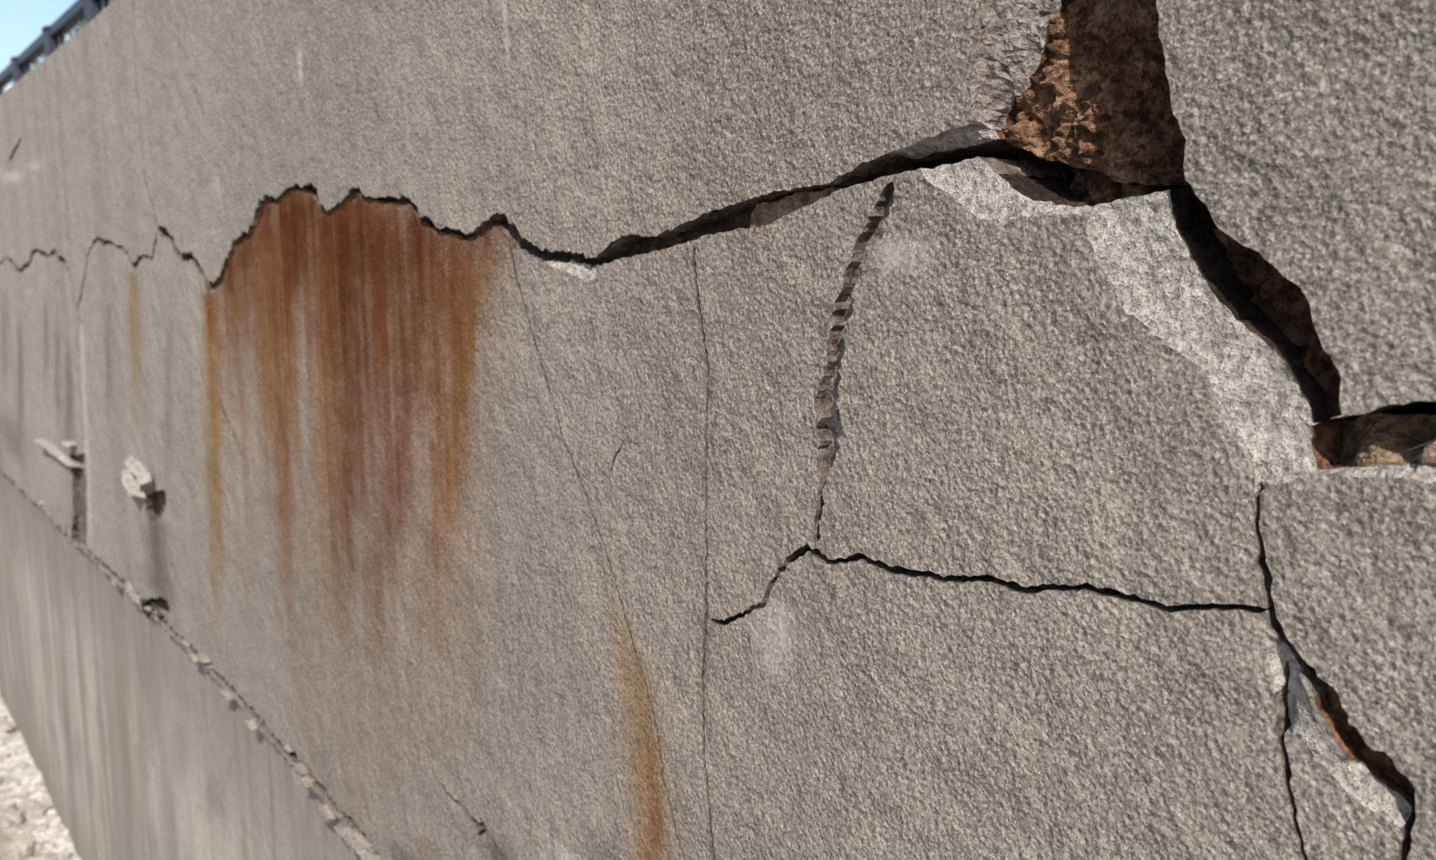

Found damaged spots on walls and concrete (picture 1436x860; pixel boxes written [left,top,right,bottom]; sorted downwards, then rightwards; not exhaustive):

crack [9,137,21,162]
crack [0,232,157,311]
crack [141,0,1436,470]
spalling [882,0,1436,493]
spalling [121,456,166,521]
crack [508,241,685,860]
crack [692,181,1416,860]
crack [89,552,380,856]
crack [432,772,506,859]
spalling [1263,632,1412,828]